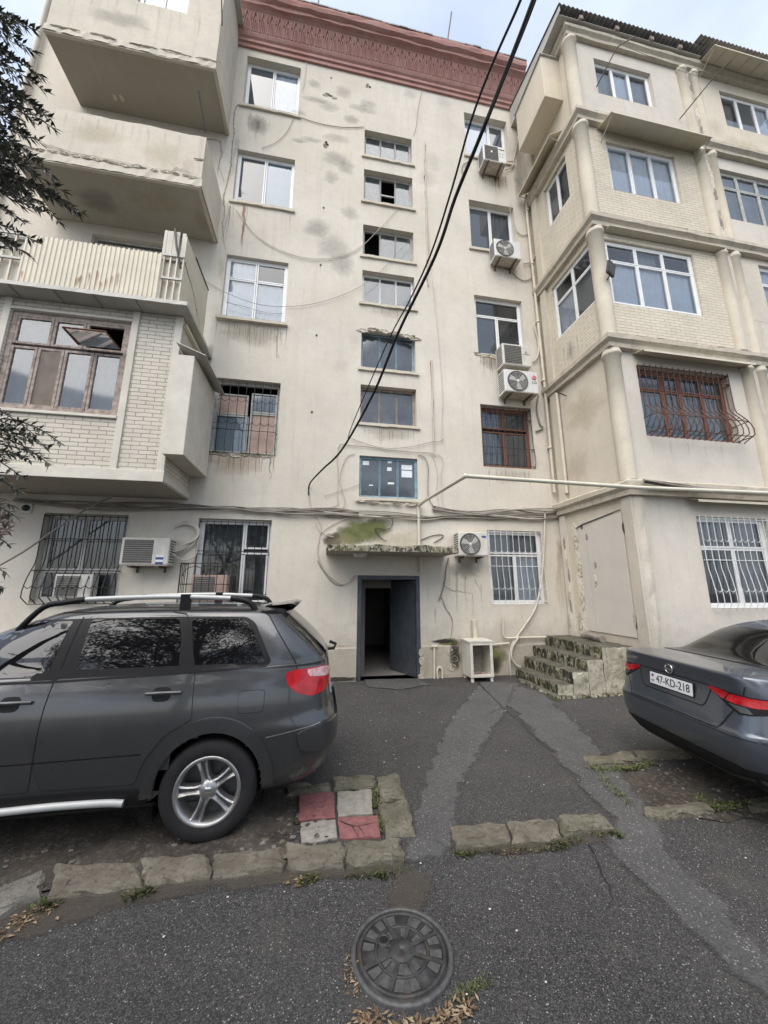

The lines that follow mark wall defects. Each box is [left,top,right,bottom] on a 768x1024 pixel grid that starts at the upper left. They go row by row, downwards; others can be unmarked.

spalling [50,24,221,63]
spalling [23,145,200,179]
spalling [356,327,421,341]
crack [588,844,613,907]